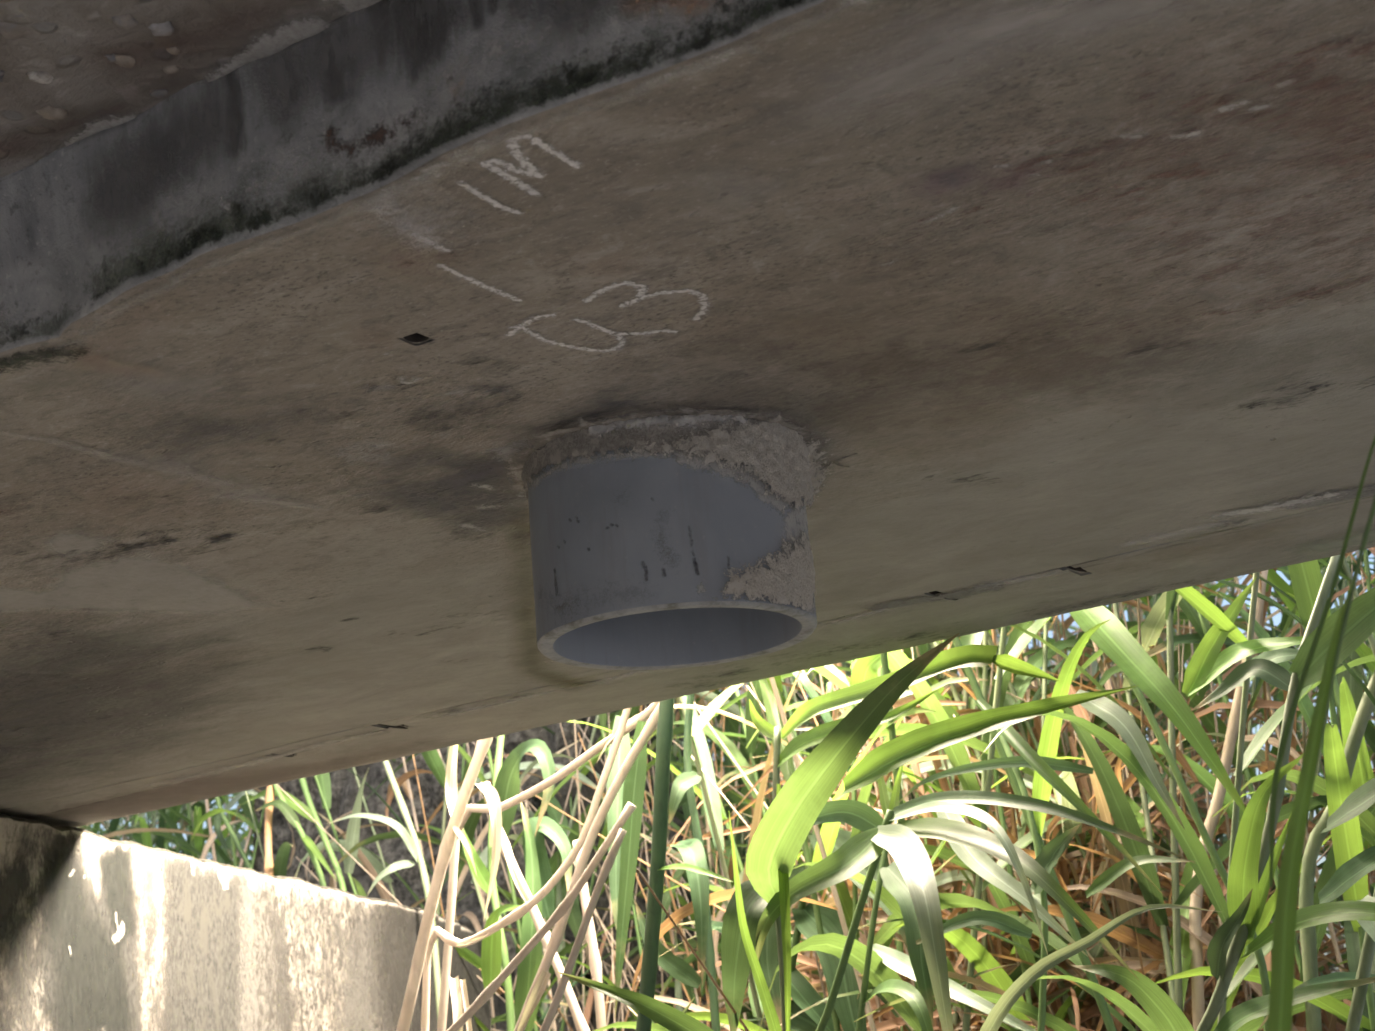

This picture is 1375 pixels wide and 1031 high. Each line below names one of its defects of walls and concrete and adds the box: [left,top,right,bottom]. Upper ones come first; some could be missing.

leakage [261,0,527,118]
leakage [93,72,243,224]
leakage [324,108,427,157]
leakage [0,826,292,1031]
leakage [349,902,491,1031]